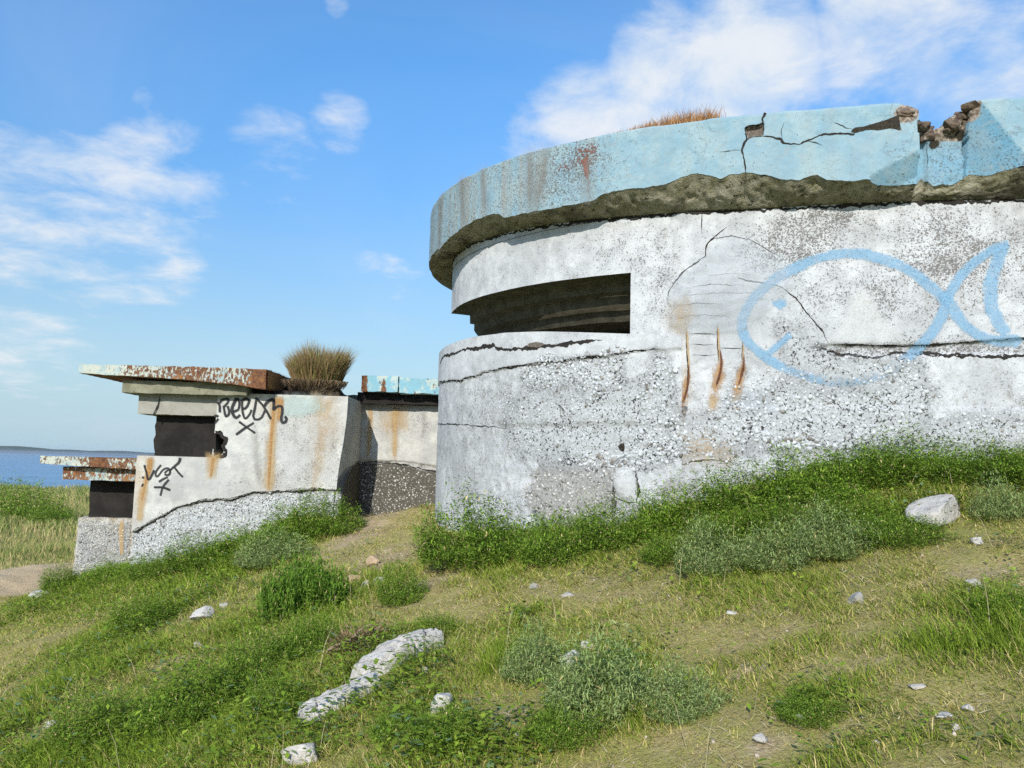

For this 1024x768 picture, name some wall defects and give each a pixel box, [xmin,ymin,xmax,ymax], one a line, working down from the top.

rust [554,139,605,179]
crack [722,112,855,179]
spalling [851,100,980,164]
crack [452,199,1024,301]
crack [739,278,1024,360]
crack [440,339,659,383]
rust [682,332,690,418]
rust [709,329,745,412]
hole [215,430,228,459]
rust [265,371,289,490]
rust [137,459,154,520]
spalling [75,491,341,571]